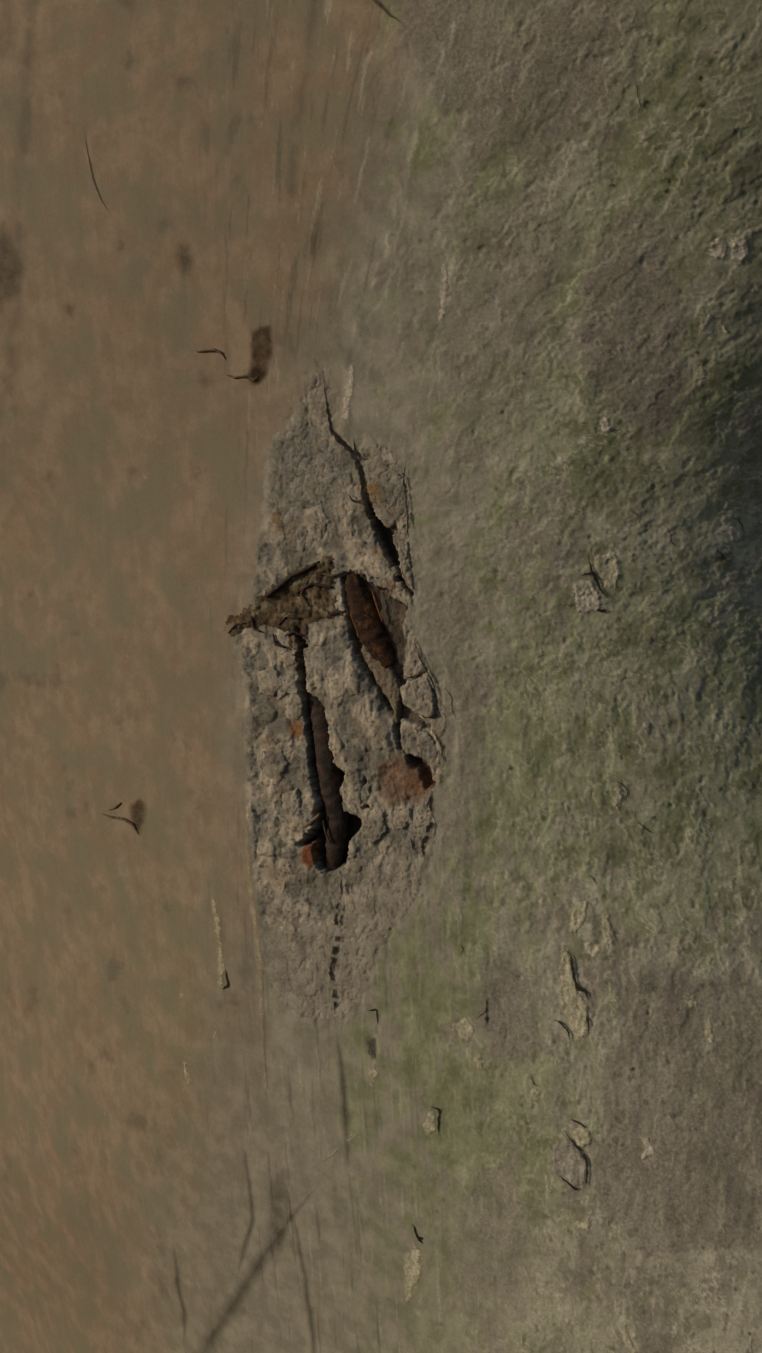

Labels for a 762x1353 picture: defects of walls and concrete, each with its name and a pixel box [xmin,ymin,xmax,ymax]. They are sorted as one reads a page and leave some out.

crack [324,383,371,520]
crack [402,464,410,536]
peeling [573,551,621,613]
spalling [234,365,447,1021]
crack [401,645,456,763]
crack [410,795,436,857]
peeling [545,1119,592,1193]